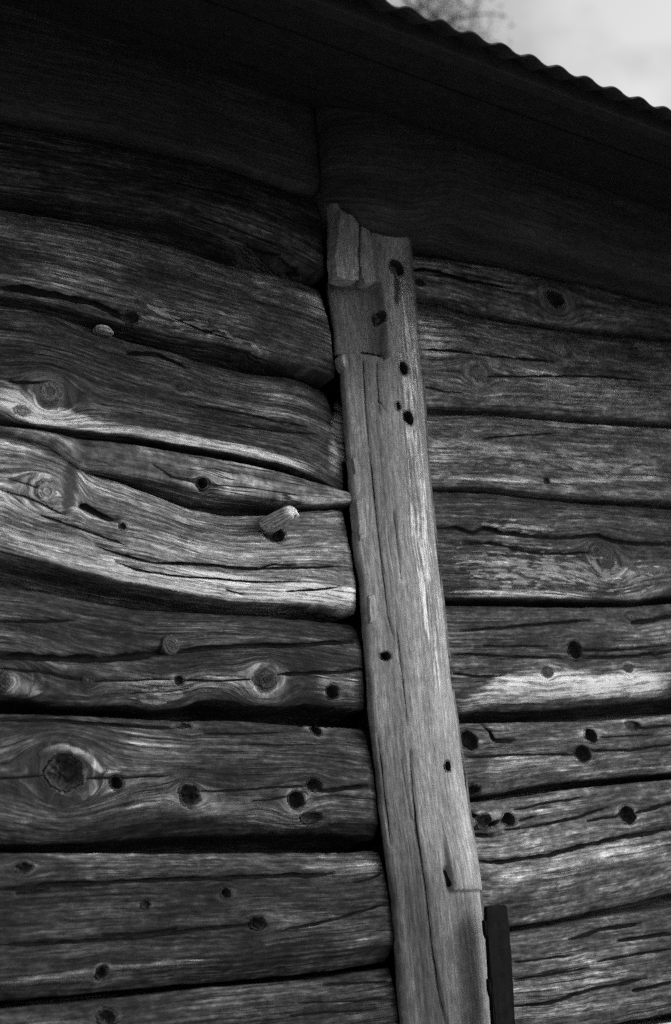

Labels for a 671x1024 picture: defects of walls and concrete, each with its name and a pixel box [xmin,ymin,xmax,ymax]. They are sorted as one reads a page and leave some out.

crack [0,478,338,595]
crack [436,526,669,555]
crack [514,923,671,1007]